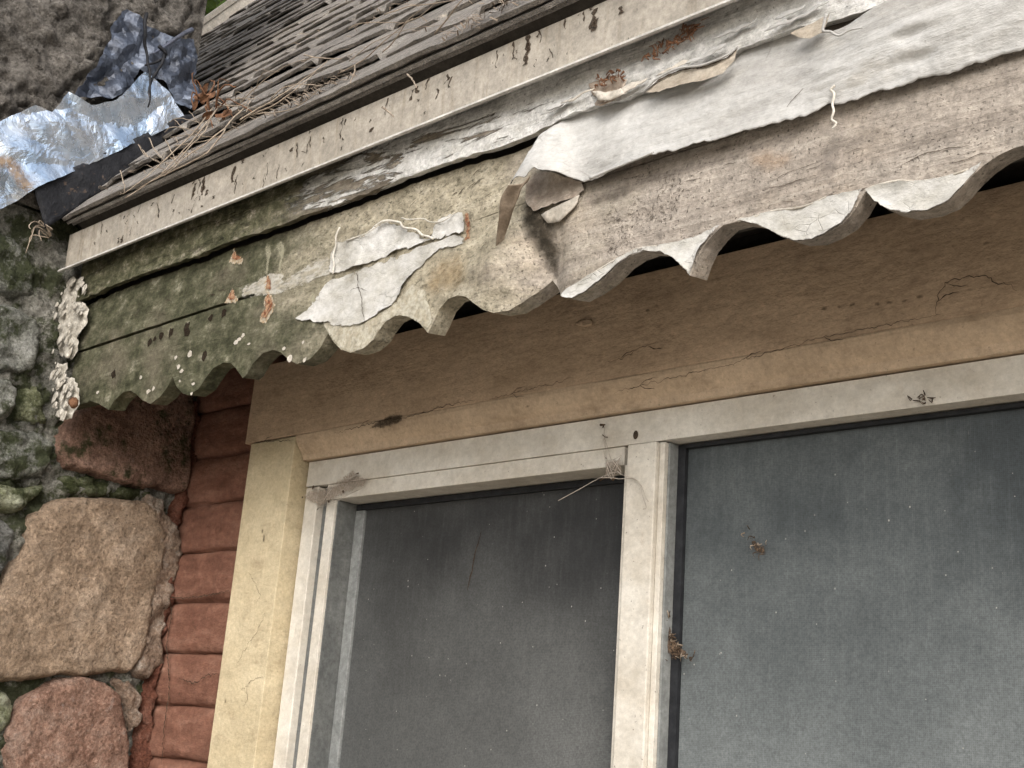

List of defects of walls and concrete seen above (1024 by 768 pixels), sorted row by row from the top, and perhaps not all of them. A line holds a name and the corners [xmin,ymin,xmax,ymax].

peeling [496,0,1024,246]
rust [224,290,238,303]
rust [229,248,243,265]
rust [260,276,275,323]
damp [266,242,284,273]
peeling [242,212,464,351]
peeling [560,225,719,298]
damp [147,322,190,346]
crack [618,275,1015,391]
crack [335,378,567,433]